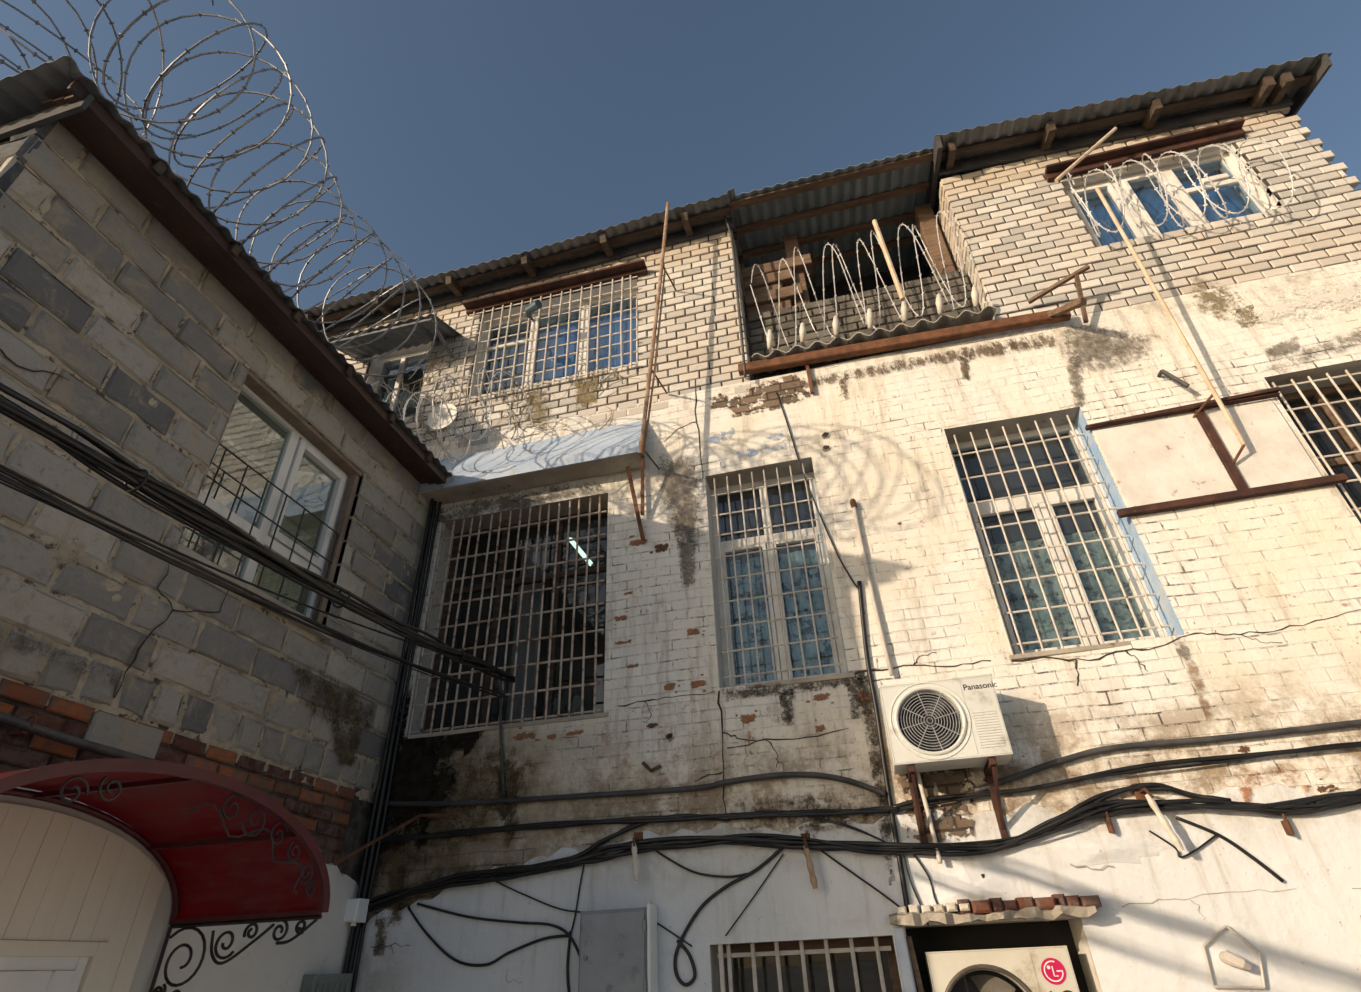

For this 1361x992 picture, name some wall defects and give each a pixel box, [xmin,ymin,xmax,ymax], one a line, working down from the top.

spalling [709,375,810,417]
spalling [629,535,673,554]
damp [675,514,695,588]
spalling [664,674,707,693]
crack [855,609,1361,686]
peeling [897,768,993,843]